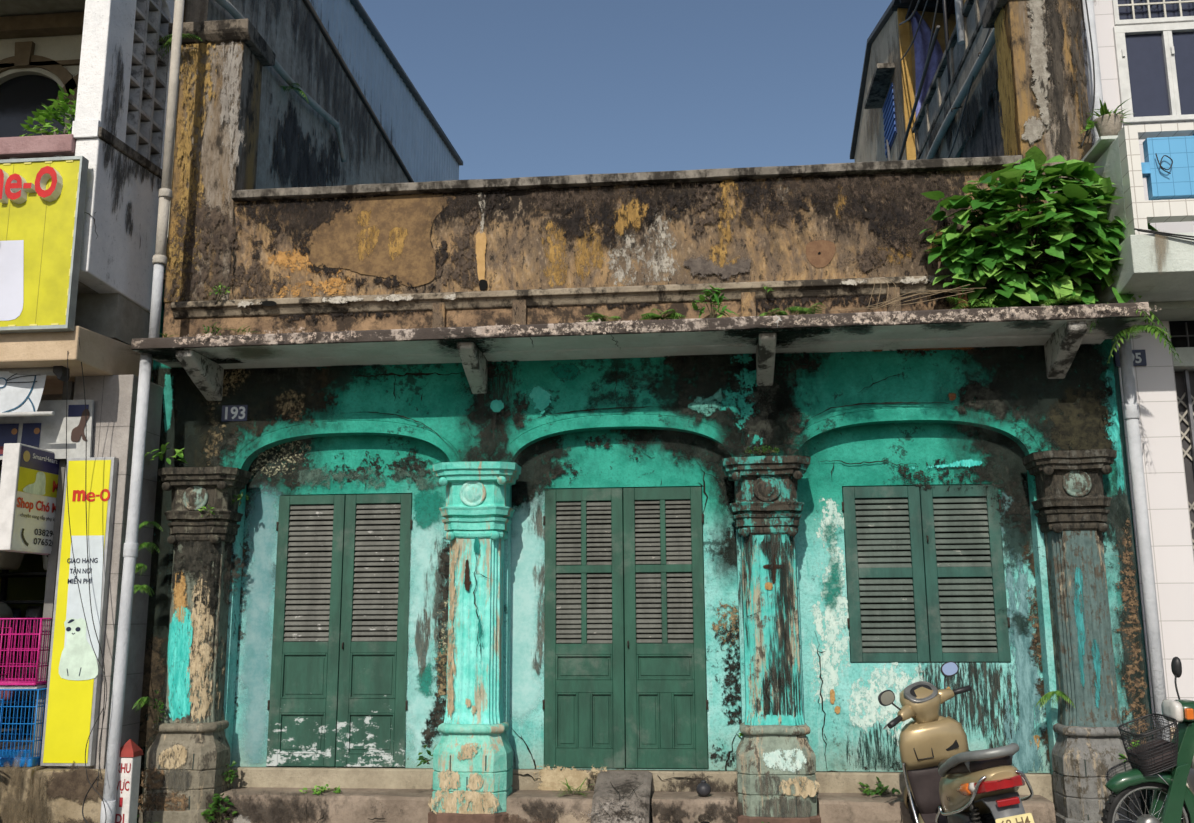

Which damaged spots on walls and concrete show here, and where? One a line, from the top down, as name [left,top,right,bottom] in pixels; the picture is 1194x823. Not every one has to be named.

damp [163,0,511,315]
peeling [601,208,679,286]
spalling [167,493,253,722]
damp [137,348,441,823]
damp [415,538,450,748]
peeling [447,539,476,723]
damp [438,335,582,539]
damp [582,295,887,726]
peeling [822,525,841,608]
damp [892,314,1140,574]
spalling [428,743,646,823]
spalling [755,749,820,818]